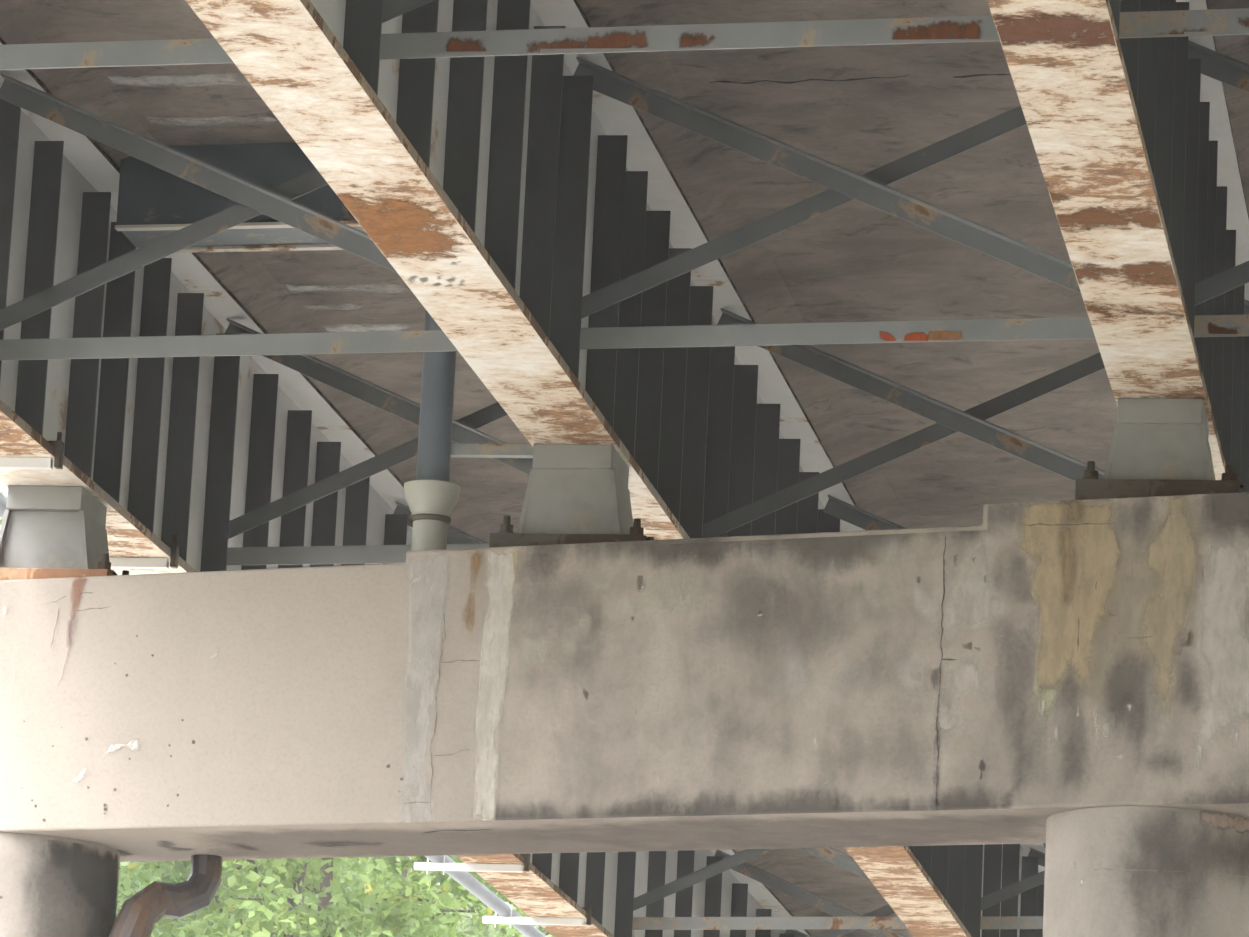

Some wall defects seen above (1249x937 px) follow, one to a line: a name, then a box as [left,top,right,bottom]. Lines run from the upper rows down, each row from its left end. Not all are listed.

corrosion [527,30,648,53]
corrosion [892,13,1116,49]
corrosion [338,190,467,261]
corrosion [1049,191,1161,232]
corrosion [1073,261,1176,286]
corrosion [1086,301,1184,319]
leakage [579,533,911,568]
leakage [475,552,556,820]
crack [936,537,957,803]
leakage [1094,659,1144,739]
leakage [576,781,869,819]
leakage [884,791,997,812]